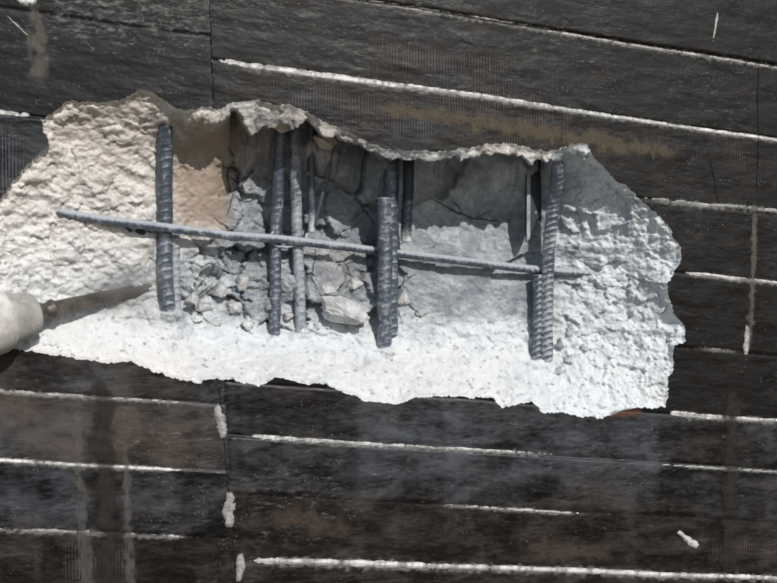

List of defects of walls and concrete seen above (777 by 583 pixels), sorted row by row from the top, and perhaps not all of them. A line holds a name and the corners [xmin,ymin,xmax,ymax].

spalling [0,90,686,419]
water stain [0,383,181,583]